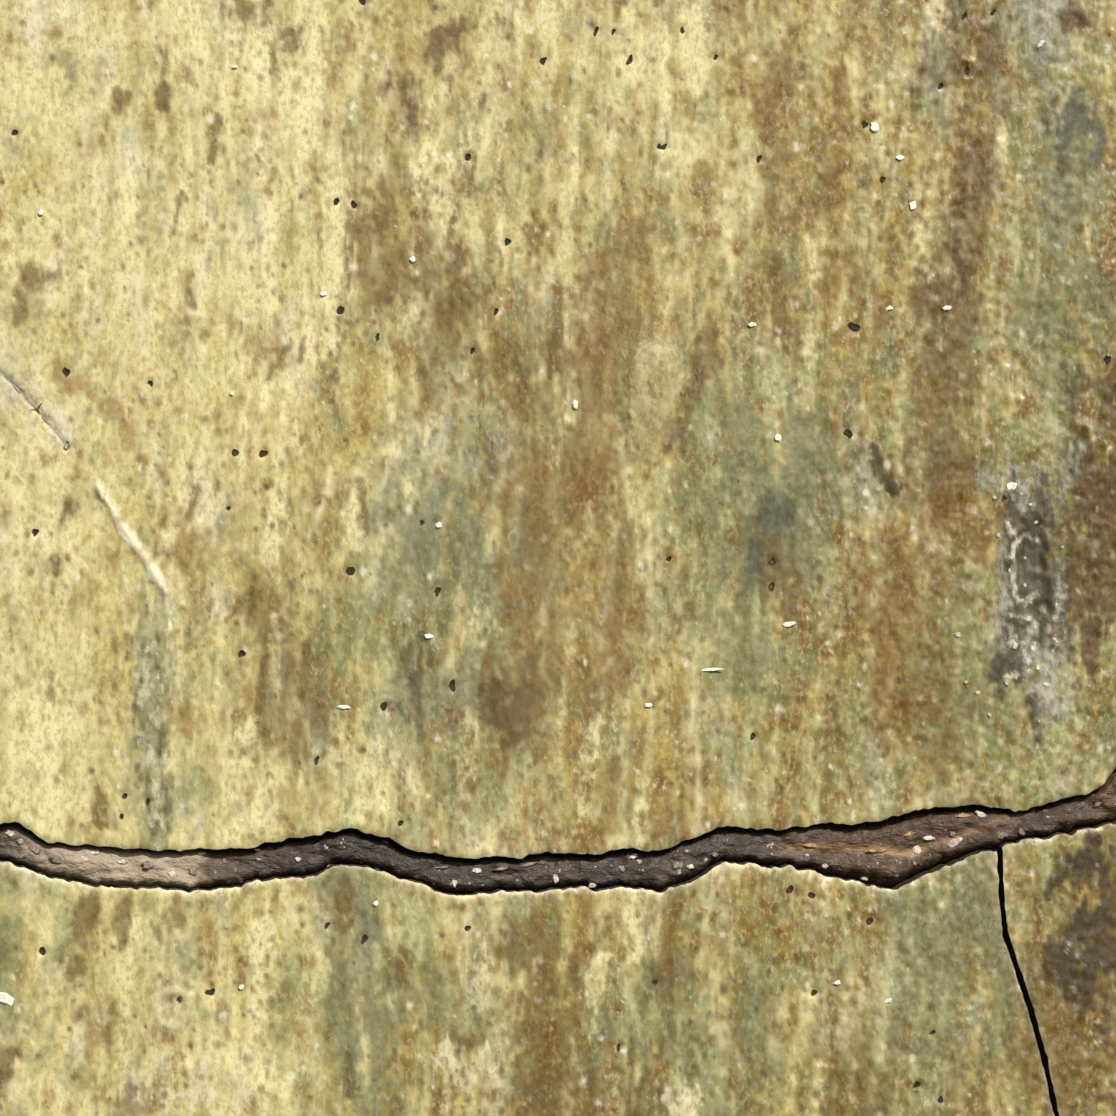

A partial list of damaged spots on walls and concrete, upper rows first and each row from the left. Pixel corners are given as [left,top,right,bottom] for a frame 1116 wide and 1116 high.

crack [0,353,72,445]
crack [0,482,1116,1116]